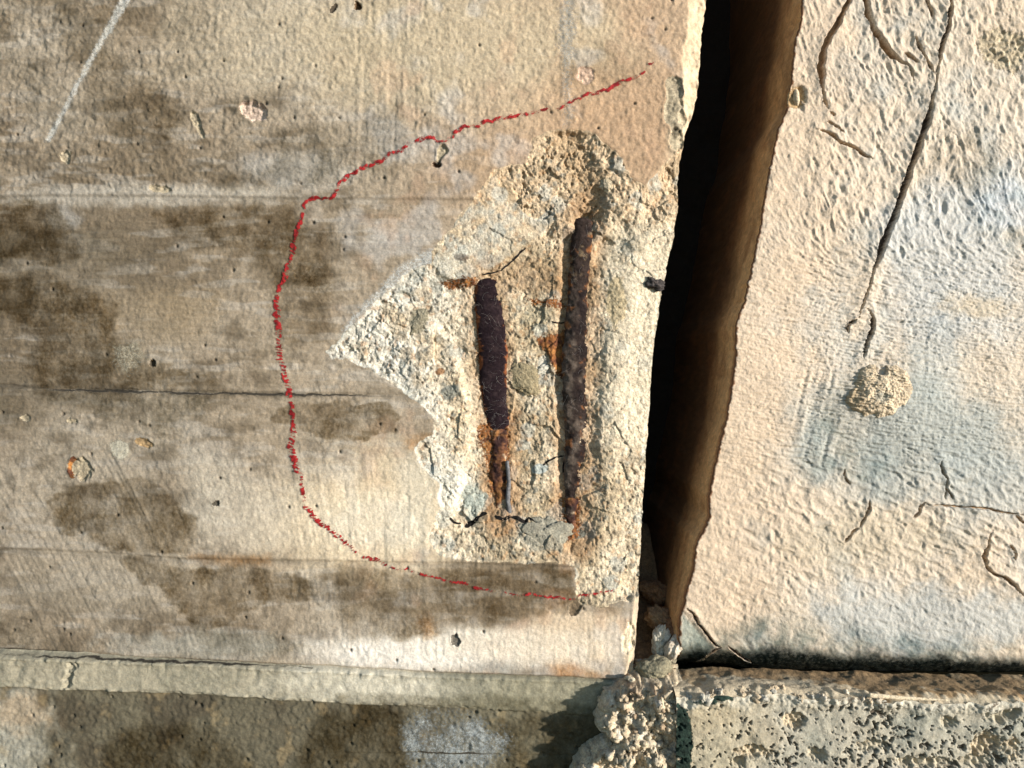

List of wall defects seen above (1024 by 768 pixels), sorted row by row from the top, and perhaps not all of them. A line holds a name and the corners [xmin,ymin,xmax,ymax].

crack [817,0,954,357]
leakage [345,251,432,331]
spalling [325,75,687,616]
efflorescence [110,440,130,461]
corrosion [475,423,496,497]
corrosion [560,496,582,541]
crack [686,608,752,663]